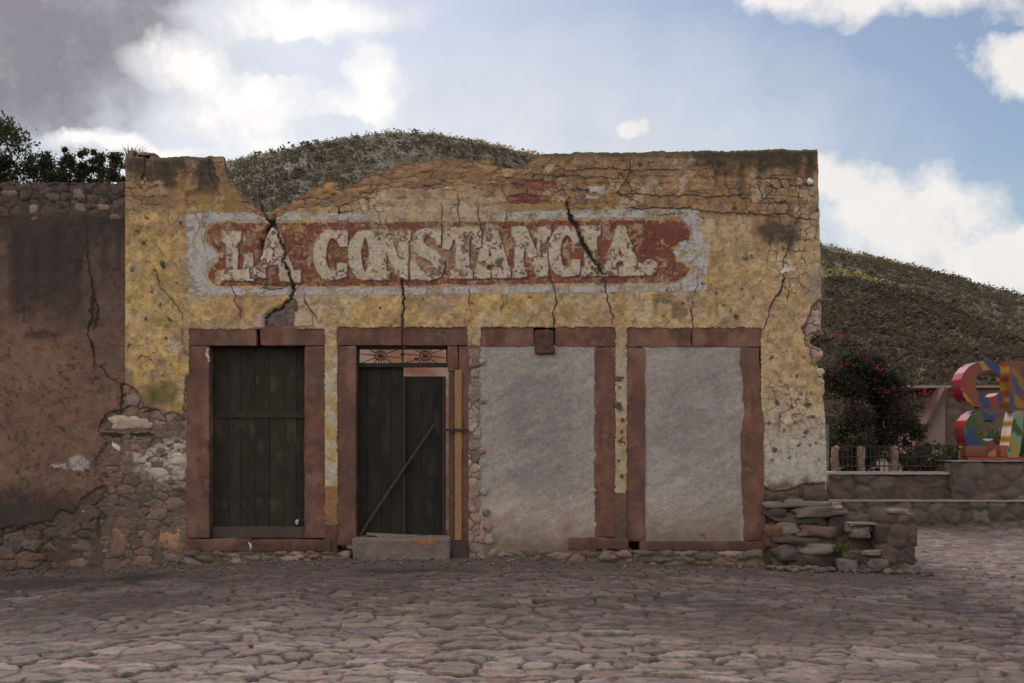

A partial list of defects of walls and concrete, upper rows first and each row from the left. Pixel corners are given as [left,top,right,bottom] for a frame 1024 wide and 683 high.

crack [68,214,154,446]
crack [230,204,319,326]
spalling [253,286,313,329]
crack [399,281,407,346]
crack [555,158,815,332]
damp [757,220,799,244]
spalling [801,302,825,379]
spalling [0,375,187,572]